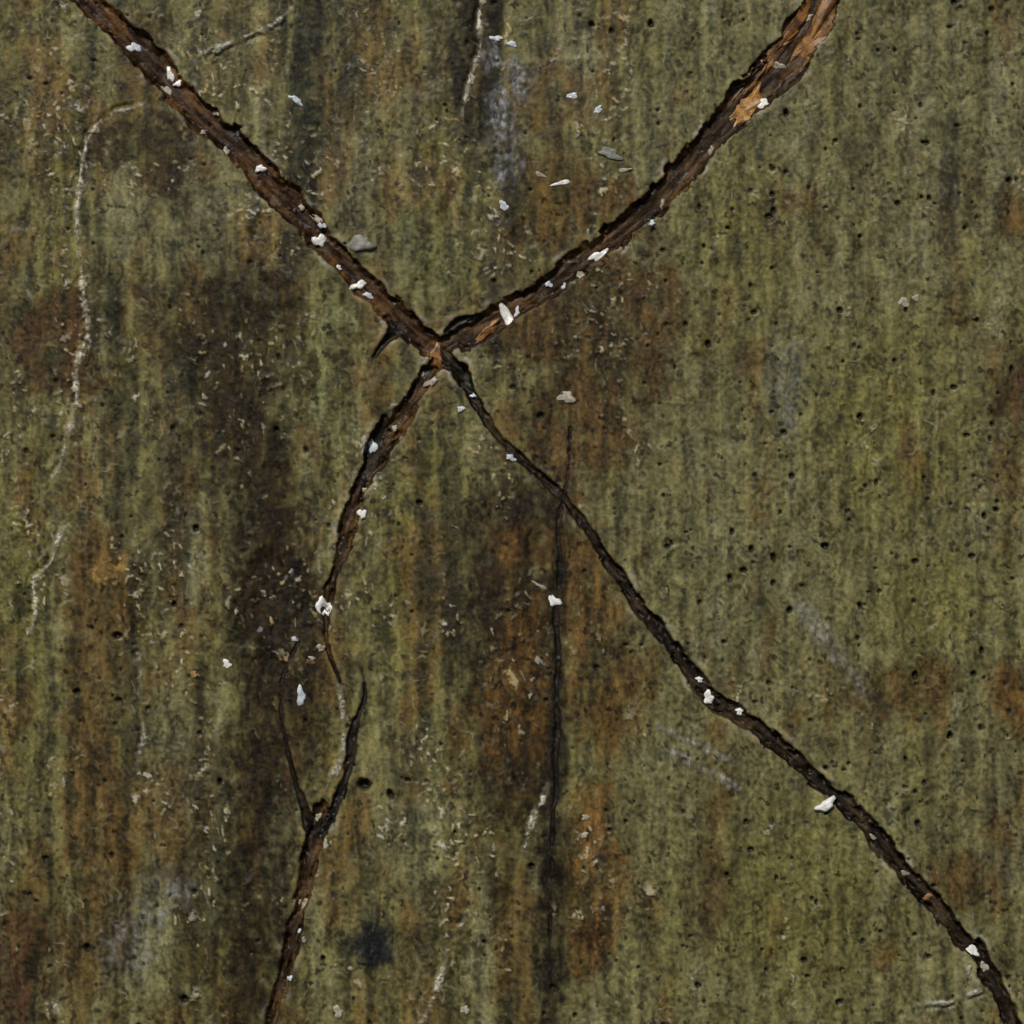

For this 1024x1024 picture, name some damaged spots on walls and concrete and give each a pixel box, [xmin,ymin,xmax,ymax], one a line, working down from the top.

crack [58,270,90,472]
crack [70,0,840,685]
crack [27,534,62,635]
damp [165,260,325,1024]
crack [264,640,367,1024]
damp [345,921,393,970]
crack [425,967,445,1017]
damp [454,475,568,1024]
crack [524,605,562,882]
crack [546,899,554,945]
crack [555,426,1022,1024]